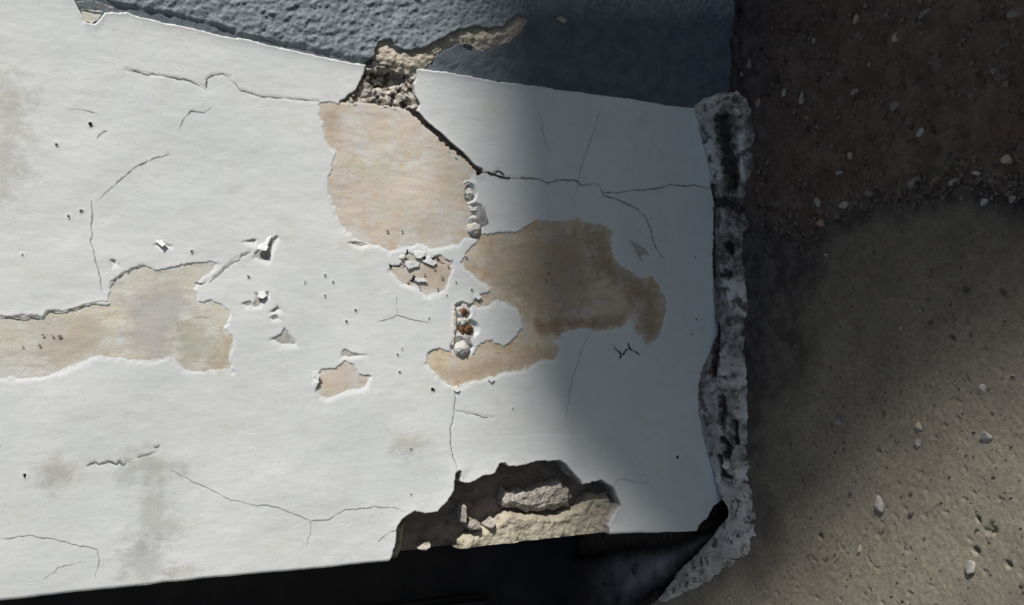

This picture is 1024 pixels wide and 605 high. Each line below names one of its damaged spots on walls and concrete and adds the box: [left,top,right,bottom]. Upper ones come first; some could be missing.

crack [126,69,316,129]
crack [0,153,169,318]
peeling [320,16,667,393]
crack [407,108,709,261]
spalling [715,115,738,192]
peeling [0,236,278,379]
peeling [313,350,371,398]
spalling [710,321,721,376]
spalling [718,395,740,478]
crack [170,469,410,541]
flaking render [392,461,613,558]
crack [3,534,99,579]